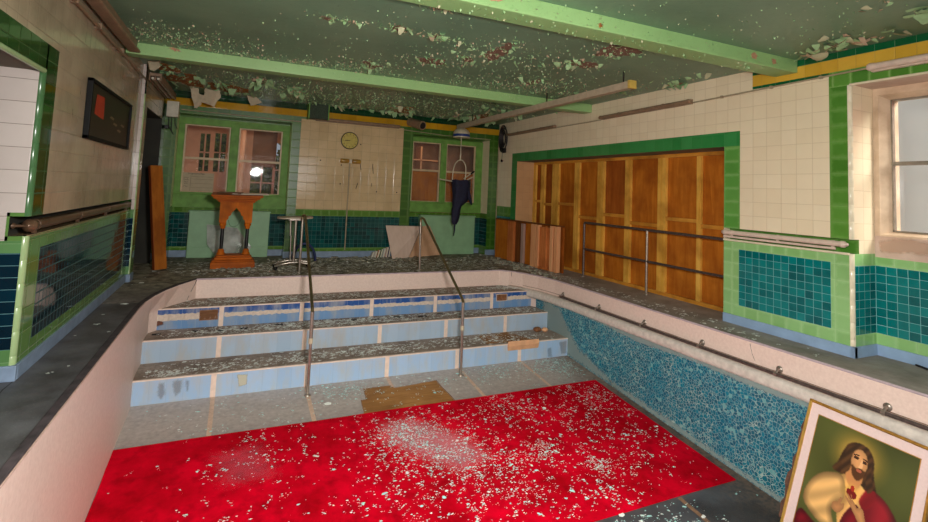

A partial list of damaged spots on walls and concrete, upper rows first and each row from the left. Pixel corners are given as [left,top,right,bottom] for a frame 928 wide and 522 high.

peeling [128,0,712,127]
peeling [722,0,912,77]
peeling [903,4,928,25]